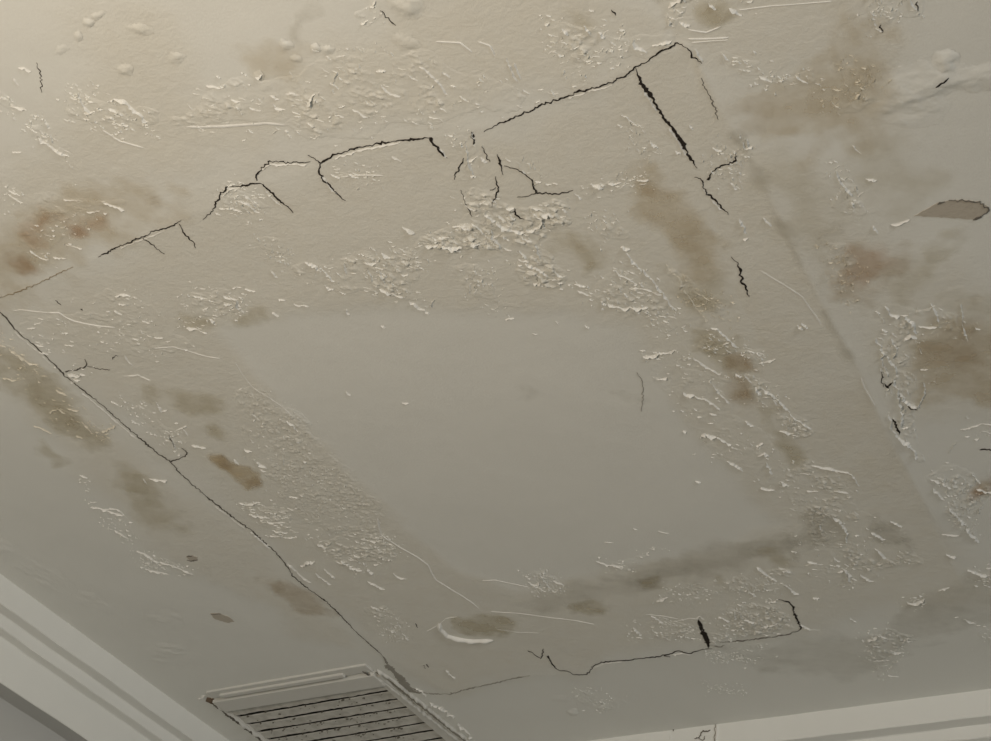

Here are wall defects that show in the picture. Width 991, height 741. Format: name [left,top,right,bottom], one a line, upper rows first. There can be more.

peeling [539,0,729,87]
crack [99,42,737,257]
peeling [702,134,757,190]
peeling [4,185,127,269]
peeling [271,187,691,339]
crack [731,257,749,296]
peeling [891,199,989,226]
peeling [677,328,815,439]
peeling [875,303,991,543]
water stain [210,455,261,489]
crack [0,267,811,695]
peeling [236,500,408,590]